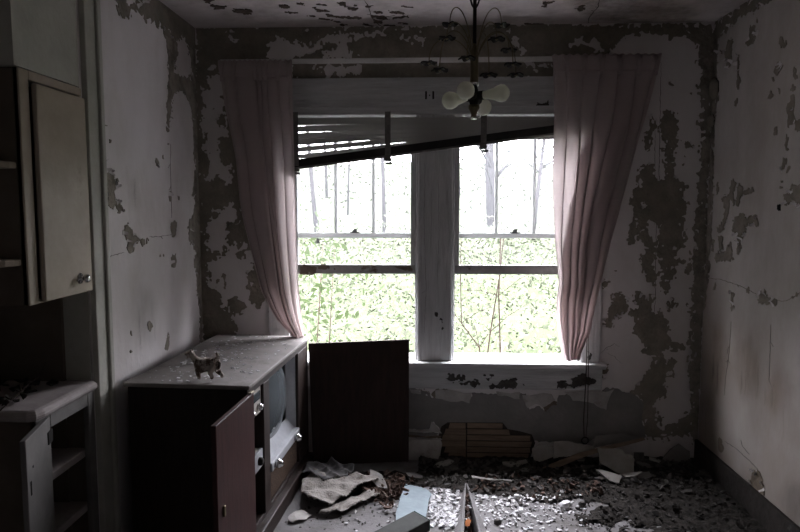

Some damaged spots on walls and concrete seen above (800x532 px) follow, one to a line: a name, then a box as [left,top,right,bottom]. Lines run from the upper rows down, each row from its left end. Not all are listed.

peeling [106,161,125,214]
peeling [115,0,772,445]
peeling [767,61,800,208]